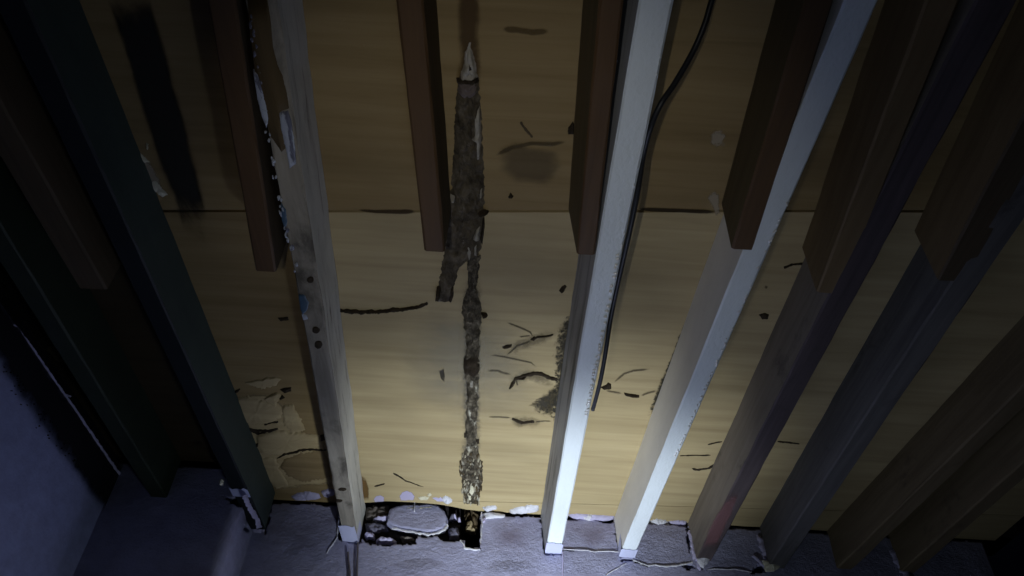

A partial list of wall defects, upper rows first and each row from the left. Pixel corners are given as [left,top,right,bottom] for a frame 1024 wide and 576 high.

water stain [440,333,487,380]
water stain [533,316,569,417]
peeling [235,377,335,501]
flaking render [359,493,539,551]